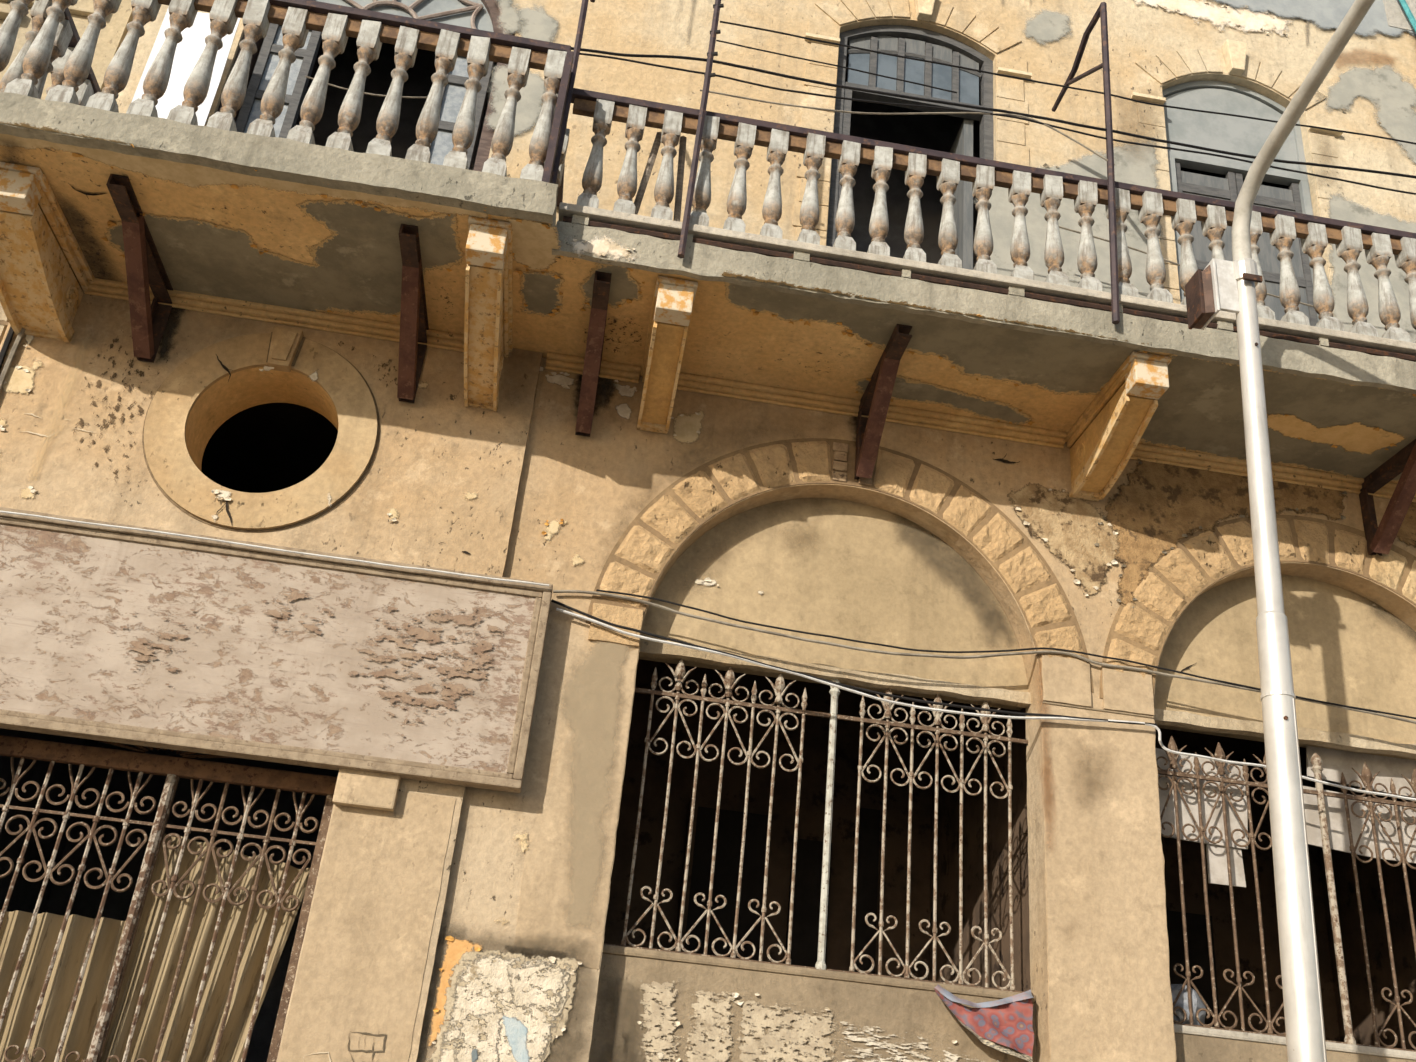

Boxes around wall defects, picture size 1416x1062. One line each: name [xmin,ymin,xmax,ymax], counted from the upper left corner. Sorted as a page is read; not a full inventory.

flaking render [1134,0,1292,36]
peeling [0,122,645,352]
rust [563,216,1188,324]
rust [1259,330,1416,362]
flaking render [1007,354,1250,608]
peeling [1263,369,1416,520]
peeling [429,936,482,1046]